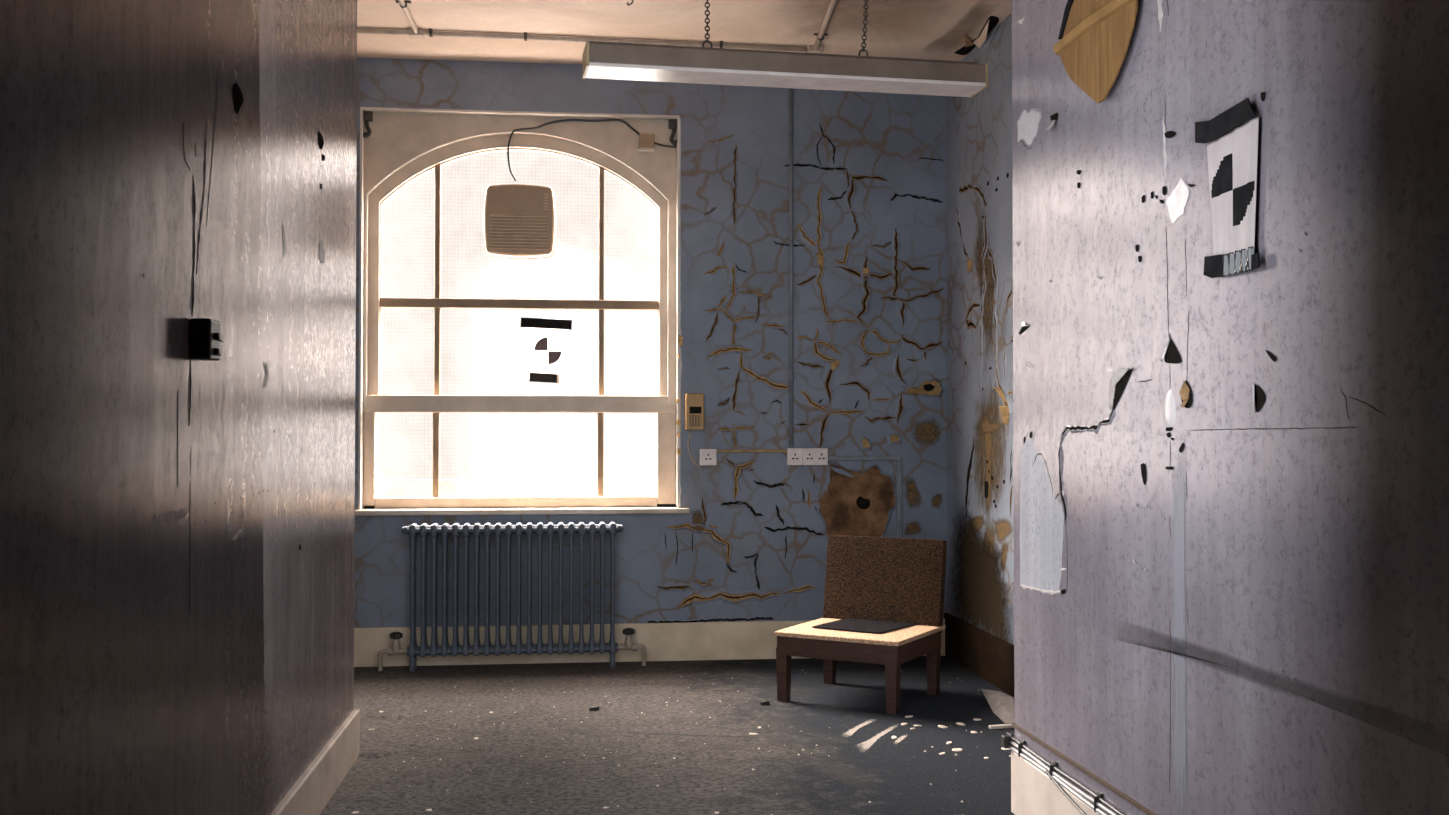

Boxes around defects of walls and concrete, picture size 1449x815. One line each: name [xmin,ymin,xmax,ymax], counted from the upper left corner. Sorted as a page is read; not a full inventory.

crack [647,123,1014,623]
flaking render [815,436,897,541]
peeling [986,431,1066,598]